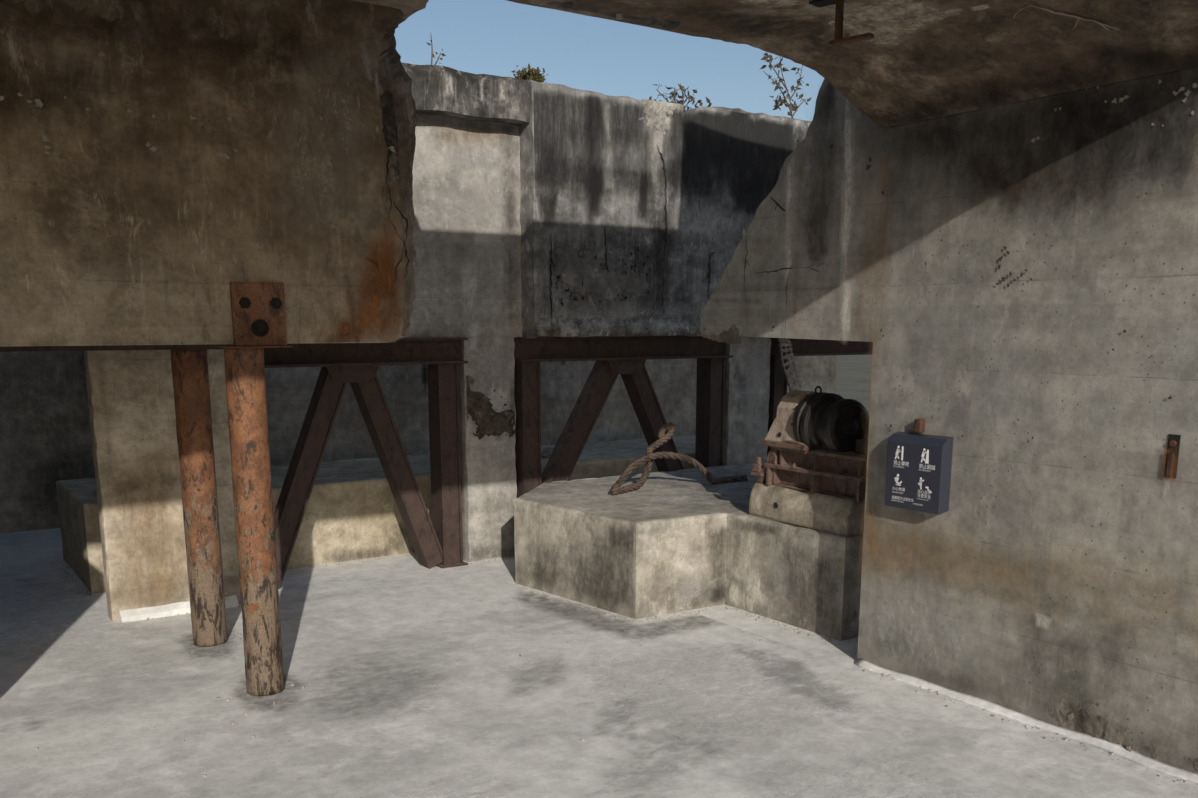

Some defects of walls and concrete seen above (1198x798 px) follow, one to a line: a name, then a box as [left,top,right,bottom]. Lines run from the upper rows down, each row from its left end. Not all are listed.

crack [366,157,409,283]
damp [536,97,792,234]
damp [1072,94,1175,174]
spalling [466,375,515,440]